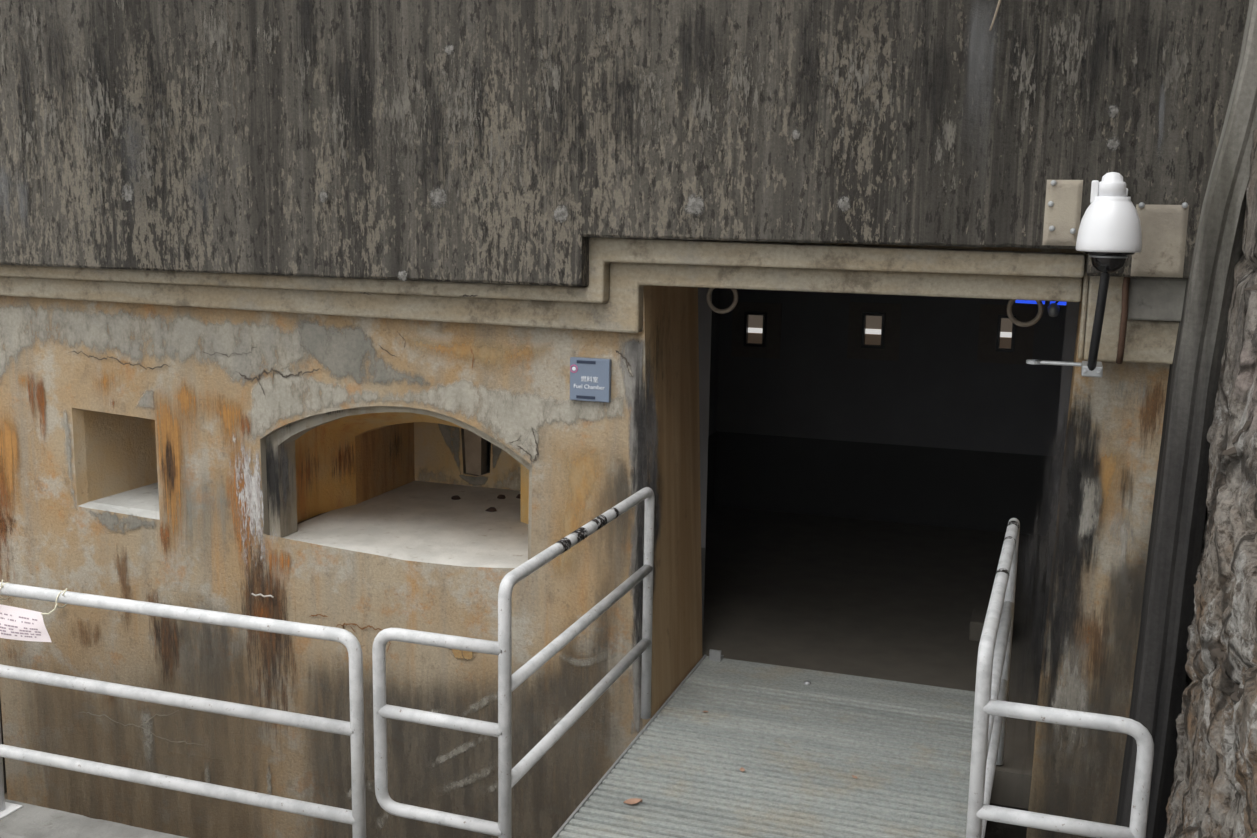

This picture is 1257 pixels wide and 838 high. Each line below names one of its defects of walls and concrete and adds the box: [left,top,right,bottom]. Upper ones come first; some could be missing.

corrosion [0,420,18,582]
corrosion [21,375,46,435]
crack [68,351,168,370]
corrosion [156,383,250,550]
corrosion [227,460,296,736]
crack [203,347,322,398]
peeling [0,304,644,732]
crack [309,614,391,652]
water stain [604,331,663,666]
water stain [1020,400,1148,718]
water stain [1038,829,1092,838]
water stain [1039,722,1127,825]